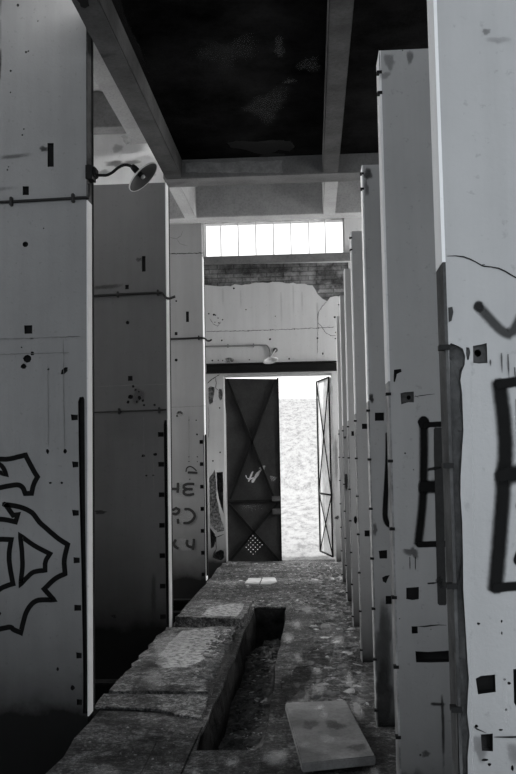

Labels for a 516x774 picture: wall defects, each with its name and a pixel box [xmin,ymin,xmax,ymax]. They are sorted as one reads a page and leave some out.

flaking render [205,262,348,305]
crack [453,255,516,278]